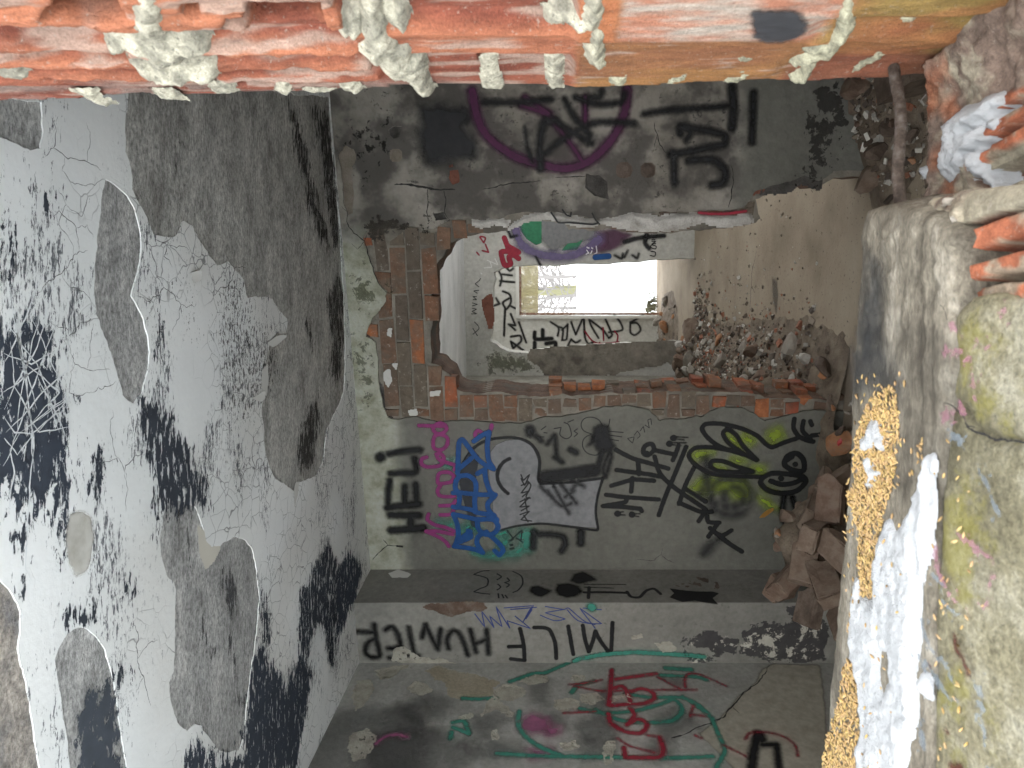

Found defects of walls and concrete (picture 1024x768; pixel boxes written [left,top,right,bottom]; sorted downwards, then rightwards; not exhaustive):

crack [37,119,116,396]
crack [139,240,246,327]
peeling [94,90,356,507]
flaking render [363,174,844,421]
crack [94,414,142,505]
peeling [55,628,127,768]
crack [133,625,156,705]
peeling [160,500,259,753]
crack [672,666,769,738]
spalling [631,605,830,663]